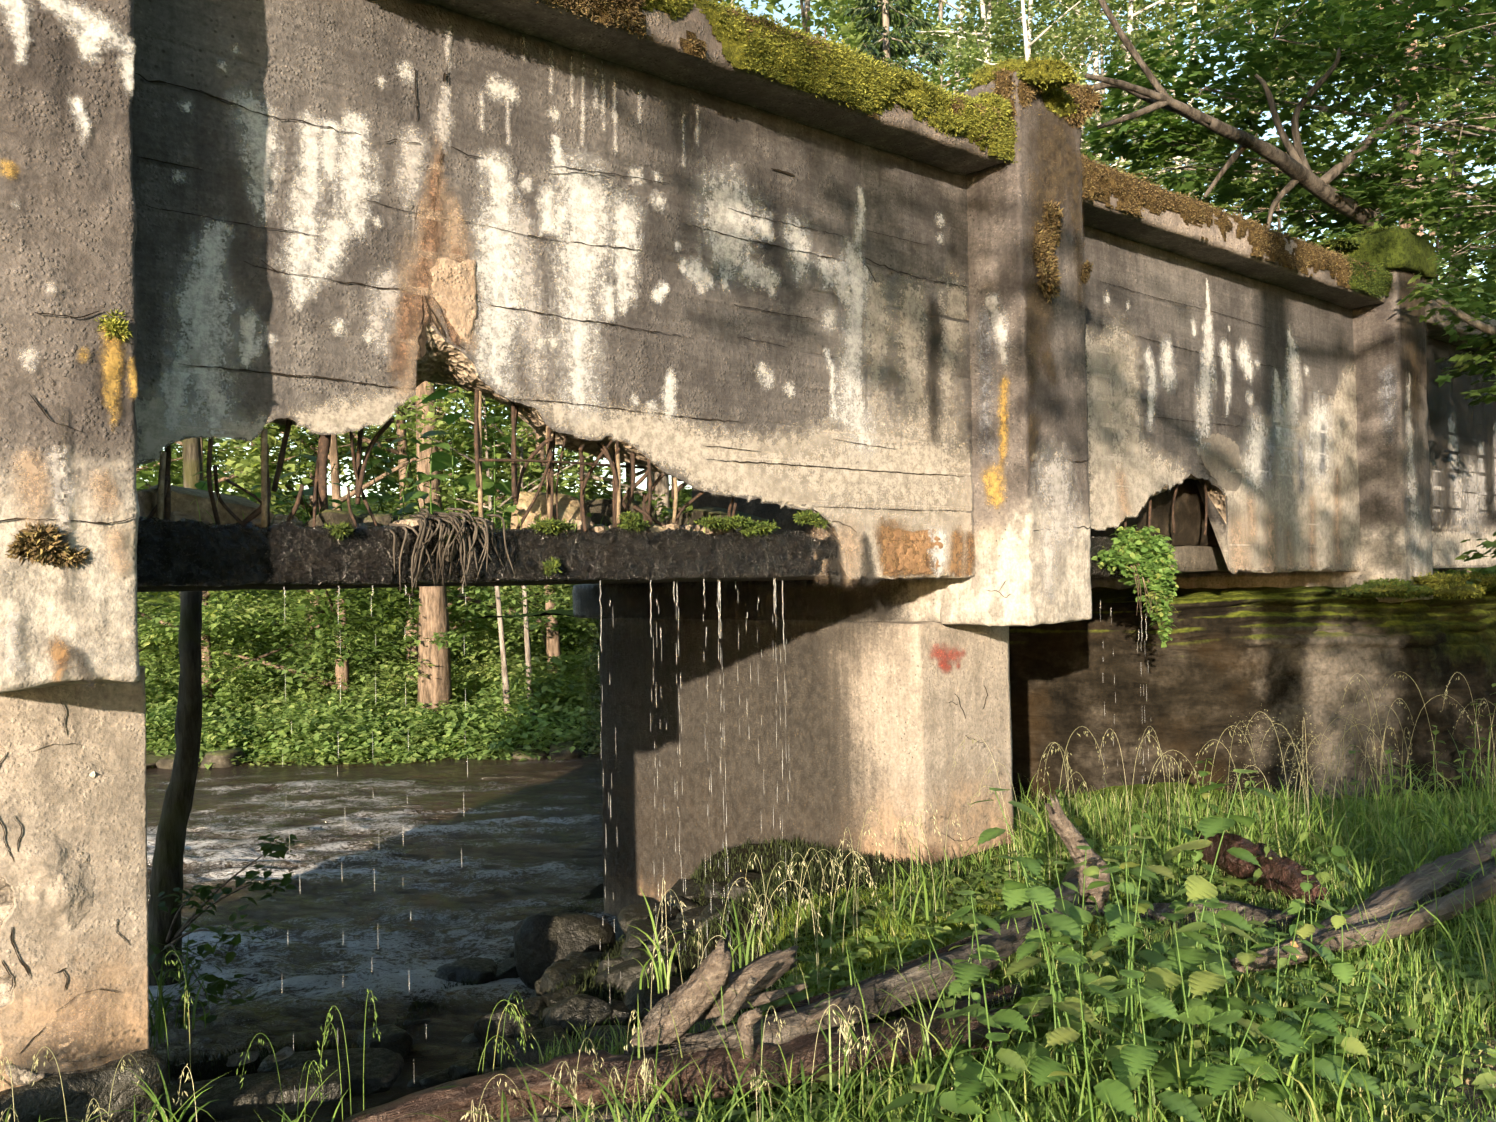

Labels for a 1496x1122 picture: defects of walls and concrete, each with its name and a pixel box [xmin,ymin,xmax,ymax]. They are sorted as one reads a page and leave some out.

efflorescence [0,0,133,91]
efflorescence [72,98,89,136]
spalling [270,418,311,431]
corrosion [396,145,473,392]
spalling [416,257,684,482]
damp [475,56,1008,903]
corrosion [816,522,975,578]
damp [1029,321,1185,598]
spalling [1148,474,1226,523]
damp [1191,278,1361,572]
damp [1380,271,1496,576]
crack [0,818,22,861]